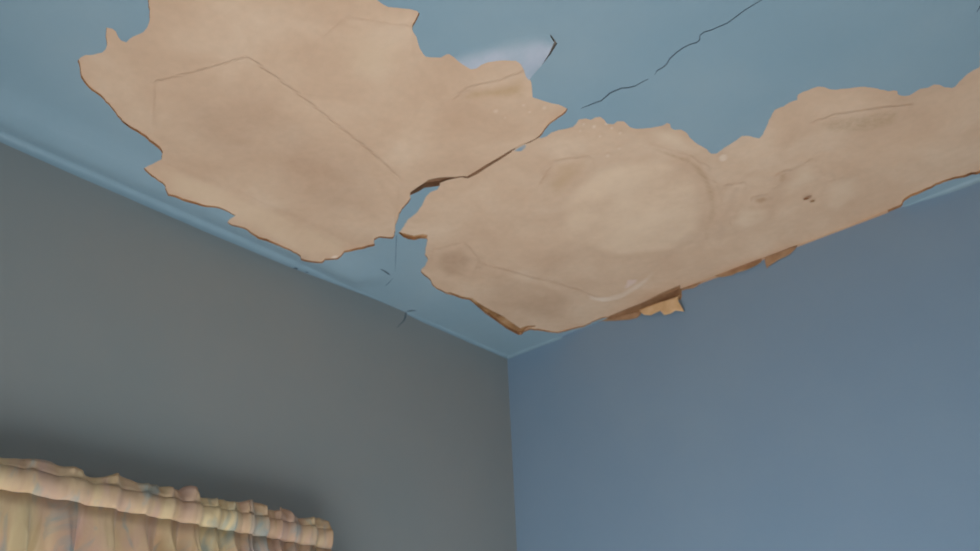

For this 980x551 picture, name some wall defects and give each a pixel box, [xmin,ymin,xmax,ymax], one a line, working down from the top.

flaking render [78,0,980,335]
crack [583,0,761,108]